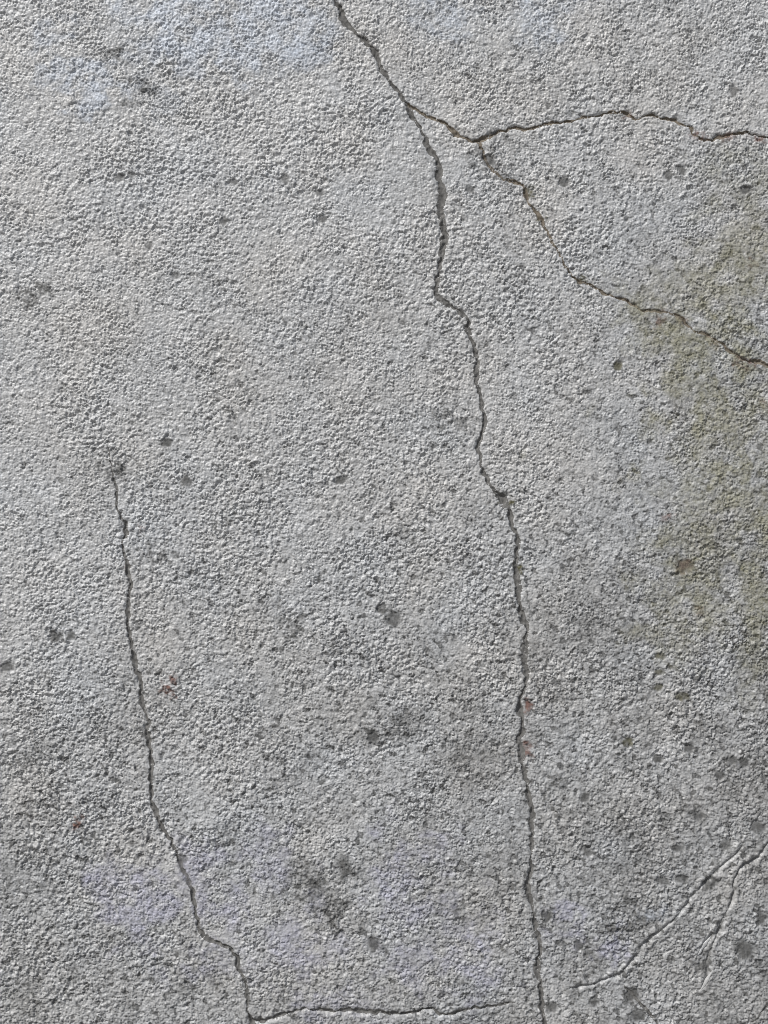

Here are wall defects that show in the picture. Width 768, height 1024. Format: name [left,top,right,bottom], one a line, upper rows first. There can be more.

crack [107,446,514,1024]
crack [334,0,768,1024]